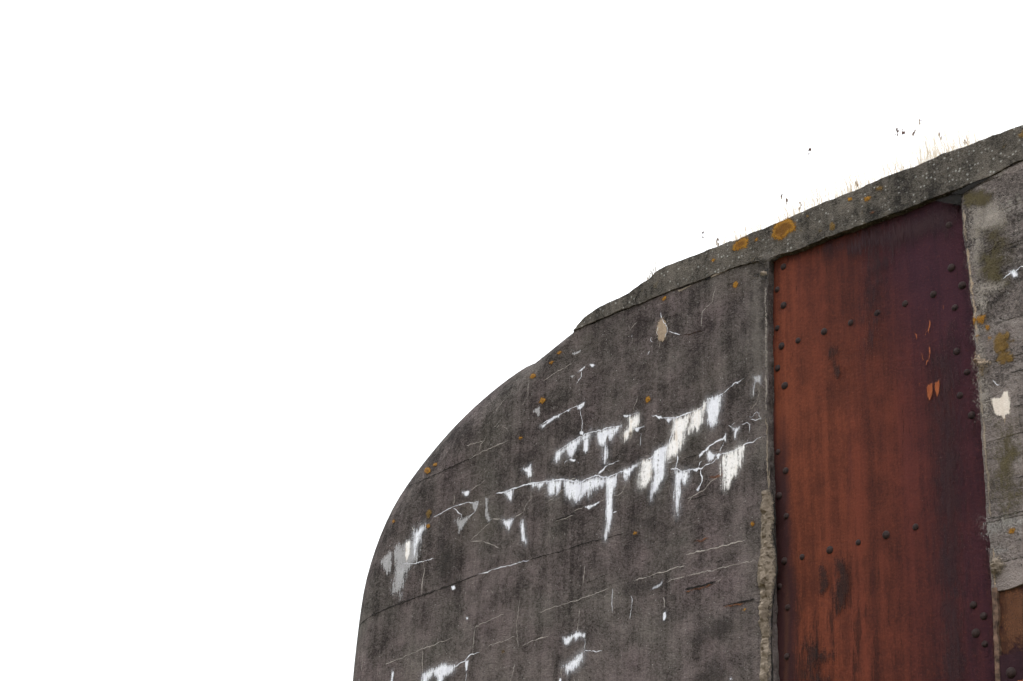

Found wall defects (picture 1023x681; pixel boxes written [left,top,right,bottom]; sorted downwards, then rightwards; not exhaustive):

rust [919,380,940,400]
leakage [438,375,761,543]
leakage [381,525,432,596]
rust [999,586,1023,655]